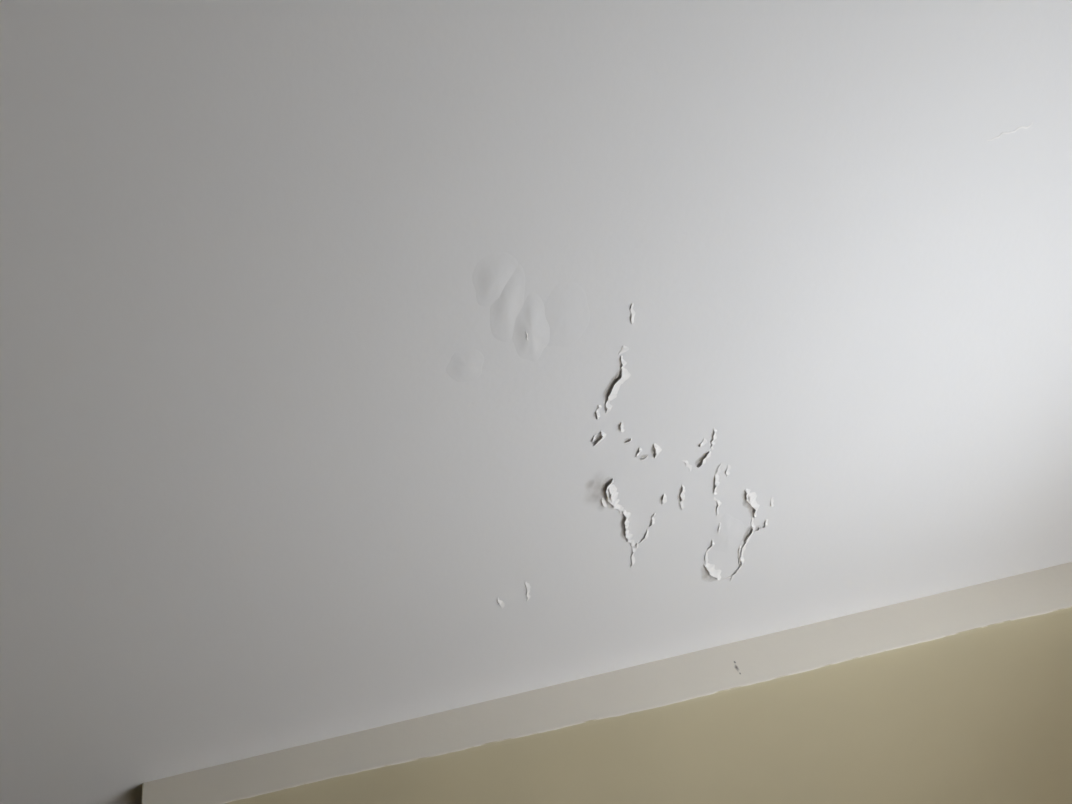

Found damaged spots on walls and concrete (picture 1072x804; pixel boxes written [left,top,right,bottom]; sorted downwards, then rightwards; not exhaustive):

peeling [592,346,631,446]
peeling [602,479,638,567]